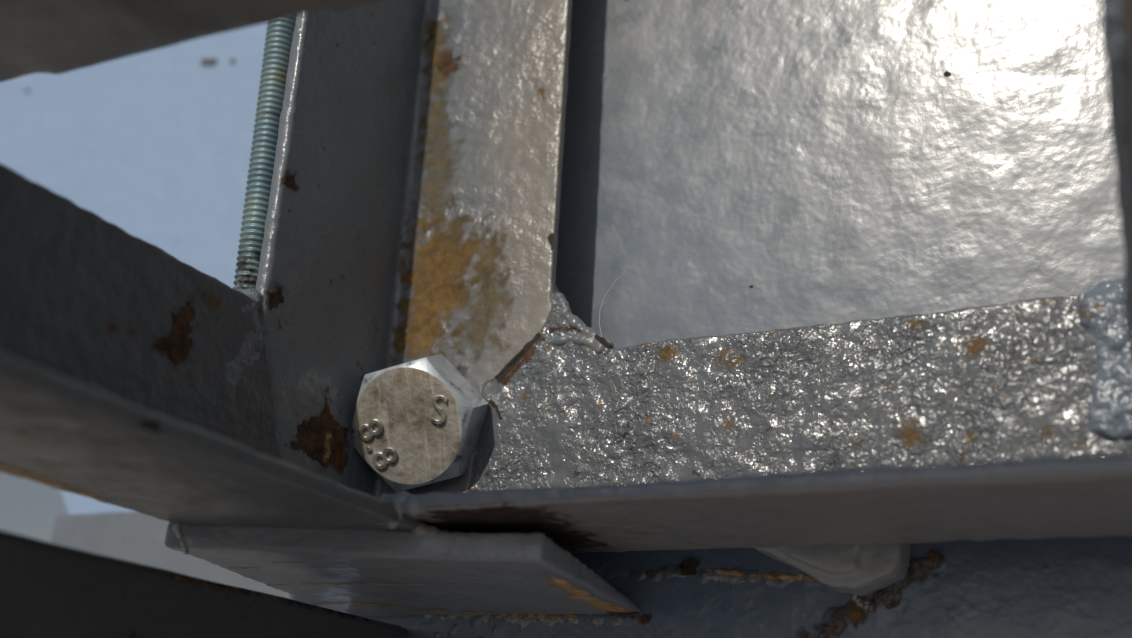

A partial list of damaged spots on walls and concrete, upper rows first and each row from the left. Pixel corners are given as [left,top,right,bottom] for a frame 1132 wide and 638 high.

corrosion [394,21,512,356]
corrosion [153,301,195,364]
corrosion [286,397,348,472]
corrosion [422,502,607,548]